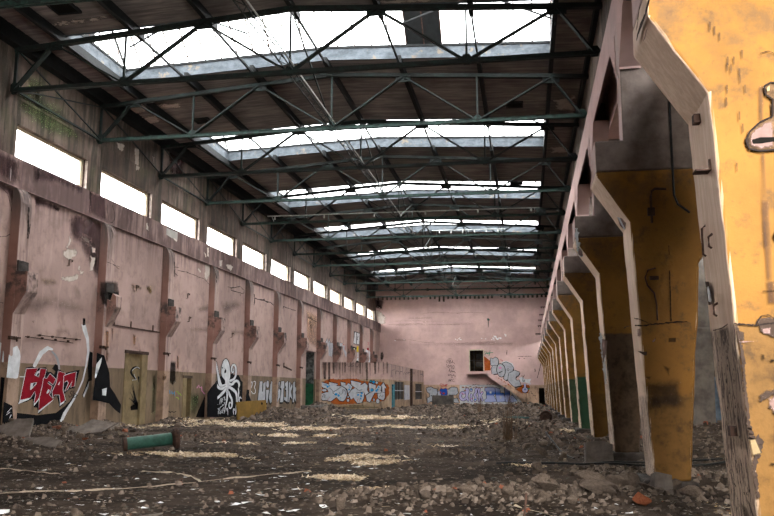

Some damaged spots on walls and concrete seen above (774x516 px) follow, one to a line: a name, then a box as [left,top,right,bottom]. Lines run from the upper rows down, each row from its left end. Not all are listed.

peeling [62,236,95,282]